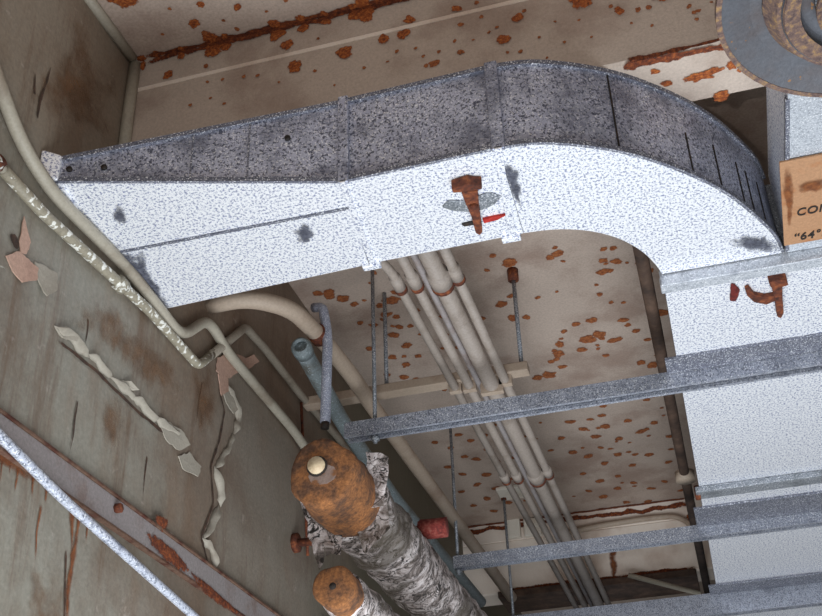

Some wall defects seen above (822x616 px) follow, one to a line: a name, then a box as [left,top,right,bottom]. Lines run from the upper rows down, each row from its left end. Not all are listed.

corrosion [137,0,409,70]
corrosion [378,15,415,44]
corrosion [624,0,822,98]
spalling [0,216,58,296]
peeling [236,354,259,369]
corrosion [357,276,466,380]
corrosion [532,317,623,380]
peeling [54,325,242,568]
corrosion [565,405,665,467]
corrosion [0,408,281,616]
corrosion [468,473,554,535]
corrosion [561,475,689,522]